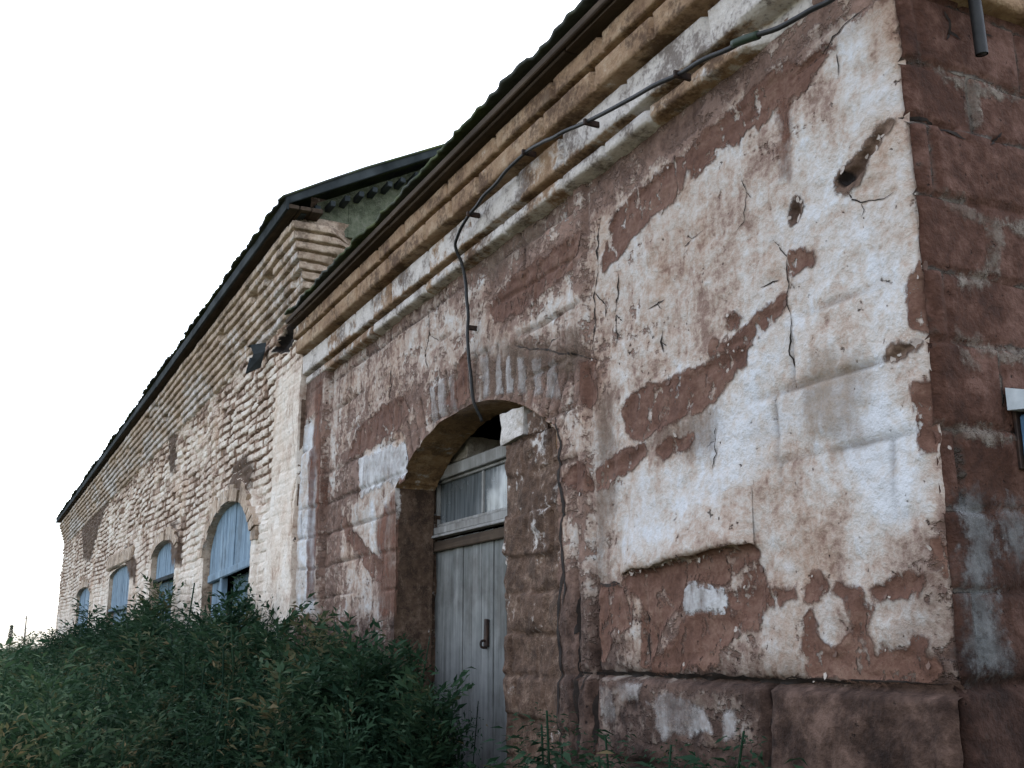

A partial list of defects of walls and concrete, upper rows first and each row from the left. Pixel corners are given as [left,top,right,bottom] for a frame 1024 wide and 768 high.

peeling [600,43,836,277]
spalling [833,117,895,196]
crack [847,191,895,215]
crack [515,219,622,360]
crack [760,240,795,366]
peeling [883,260,929,363]
peeling [348,394,410,460]
peeling [560,292,787,496]
peeling [909,378,952,453]
peeling [340,515,384,583]
crack [555,417,948,768]
peeling [599,541,943,689]